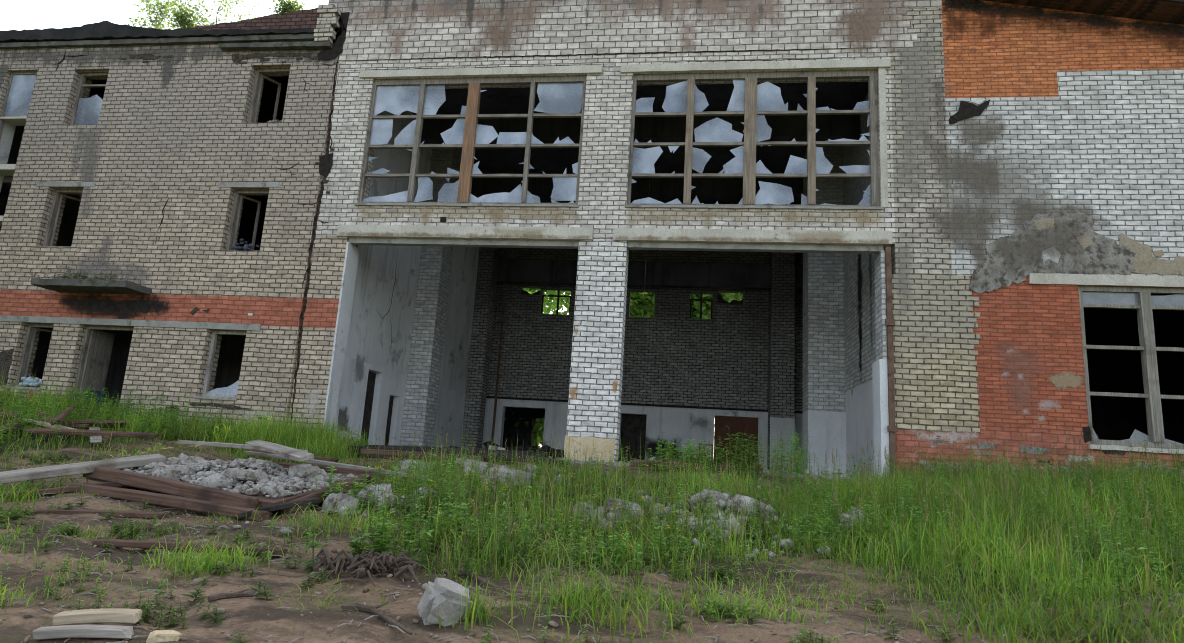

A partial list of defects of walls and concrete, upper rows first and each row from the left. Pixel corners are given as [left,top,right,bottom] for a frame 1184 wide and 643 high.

damp [356,0,537,54]
damp [602,0,779,48]
damp [832,0,899,42]
damp [0,44,331,88]
damp [932,120,1003,193]
damp [1016,200,1091,224]
damp [936,207,996,267]
peeling [969,210,1184,294]
spalling [0,349,13,386]